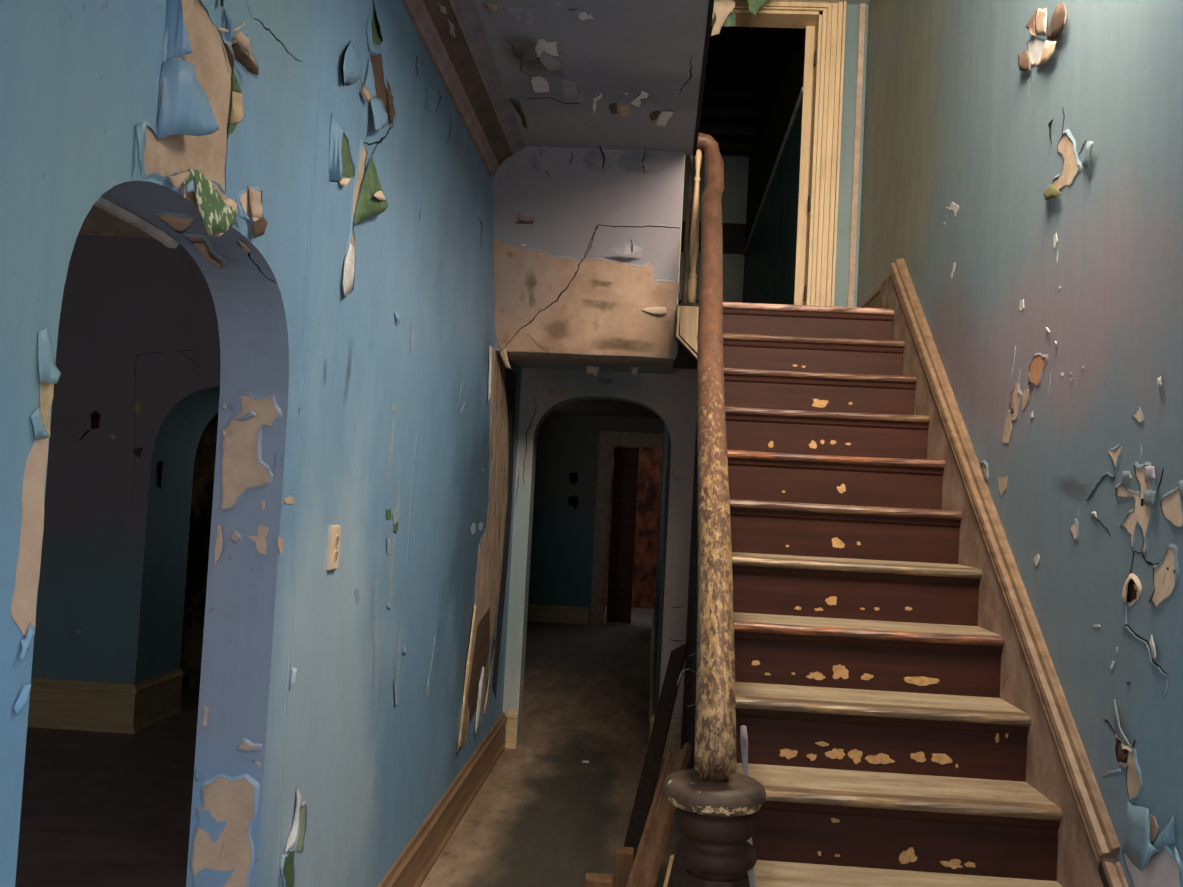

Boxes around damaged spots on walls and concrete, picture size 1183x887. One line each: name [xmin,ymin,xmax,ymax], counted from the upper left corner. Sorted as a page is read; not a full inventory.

peeling [135,0,268,269]
peeling [329,0,396,298]
peeling [711,0,768,36]
peeling [1018,2,1067,91]
crack [504,223,681,351]
peeling [11,327,61,661]
flaking render [457,238,680,752]
crack [1086,472,1115,535]
peeling [1108,441,1183,624]
crack [1121,624,1169,699]
peeling [189,738,262,887]
peeling [1101,698,1183,887]